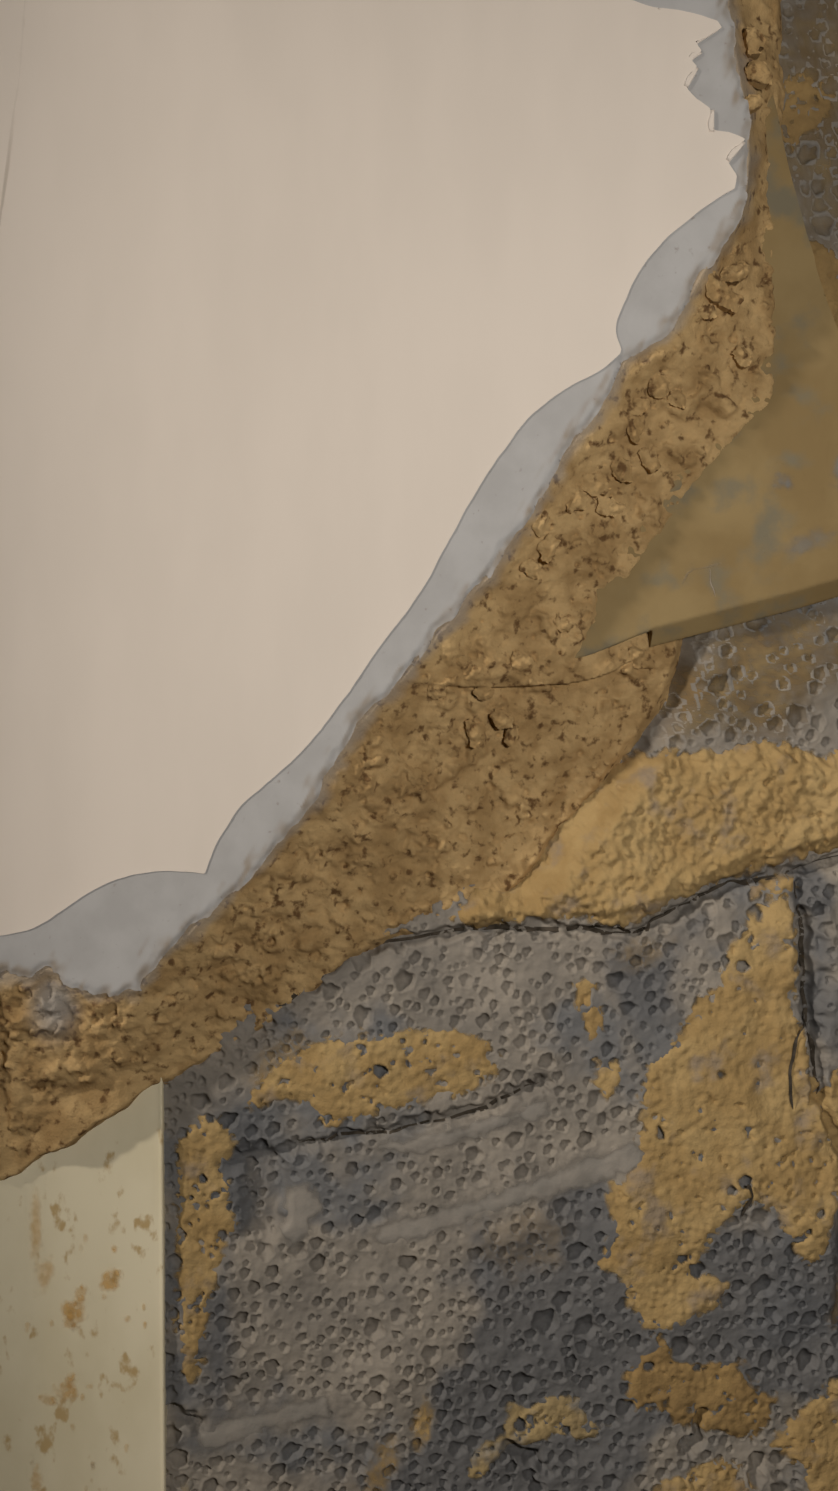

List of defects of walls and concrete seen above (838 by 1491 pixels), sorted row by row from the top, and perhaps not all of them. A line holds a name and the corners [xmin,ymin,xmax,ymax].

spalling [0,0,785,1181]
crack [383,855,838,1112]
crack [299,1083,537,1143]